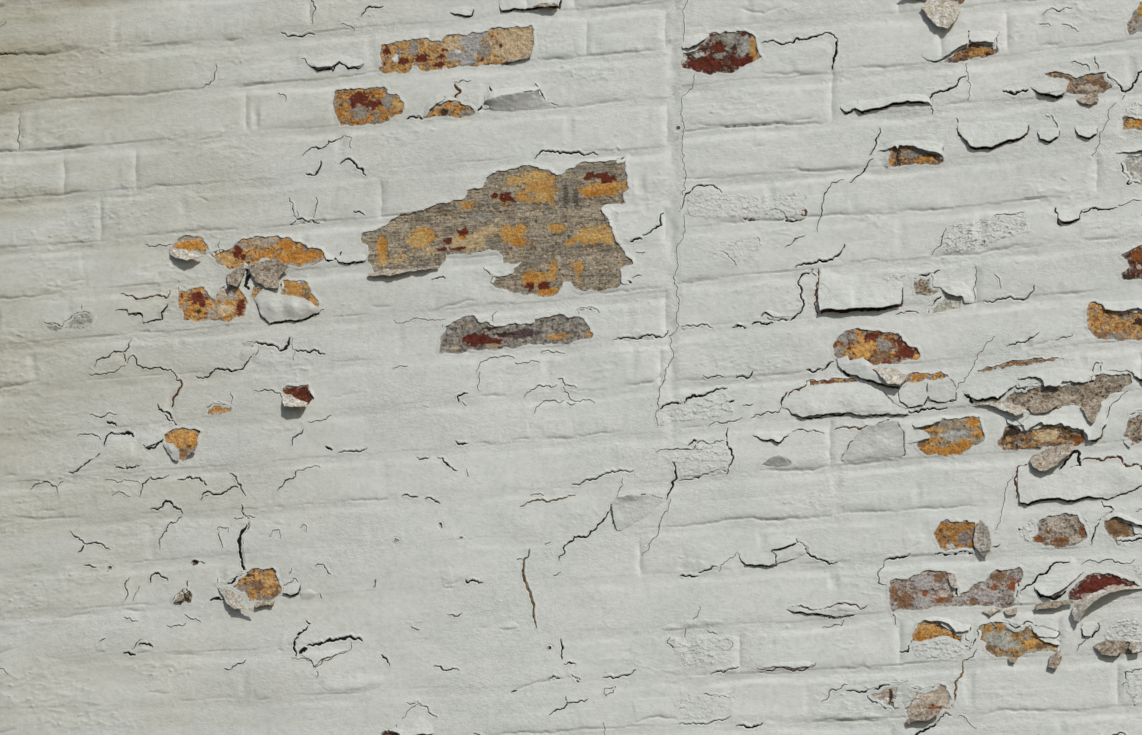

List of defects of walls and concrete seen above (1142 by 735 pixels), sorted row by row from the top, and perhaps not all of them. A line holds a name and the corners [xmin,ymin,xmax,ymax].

peeling [301,0,562,129]
peeling [678,27,840,78]
peeling [876,140,947,170]
peeling [1002,56,1142,227]
peeling [116,153,641,357]
crack [614,74,696,427]
crack [89,410,118,428]
crack [88,339,185,409]
crack [276,414,369,492]
peeling [609,210,1142,727]
crack [69,530,111,570]
crack [105,471,309,624]